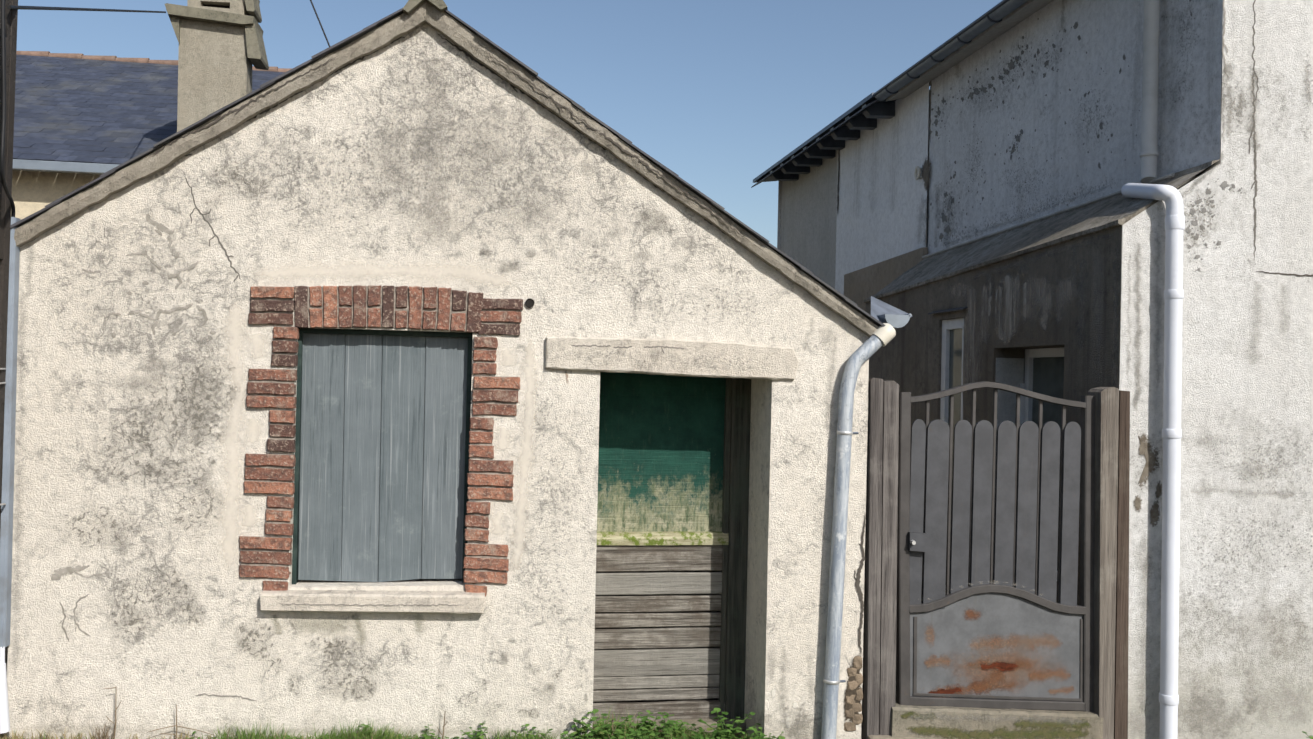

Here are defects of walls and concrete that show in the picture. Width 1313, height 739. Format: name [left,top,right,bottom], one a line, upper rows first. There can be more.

crack [142,35,407,281]
crack [1222,0,1313,277]
spalling [1134,433,1162,527]
crack [60,570,205,641]
rust [929,660,1031,697]